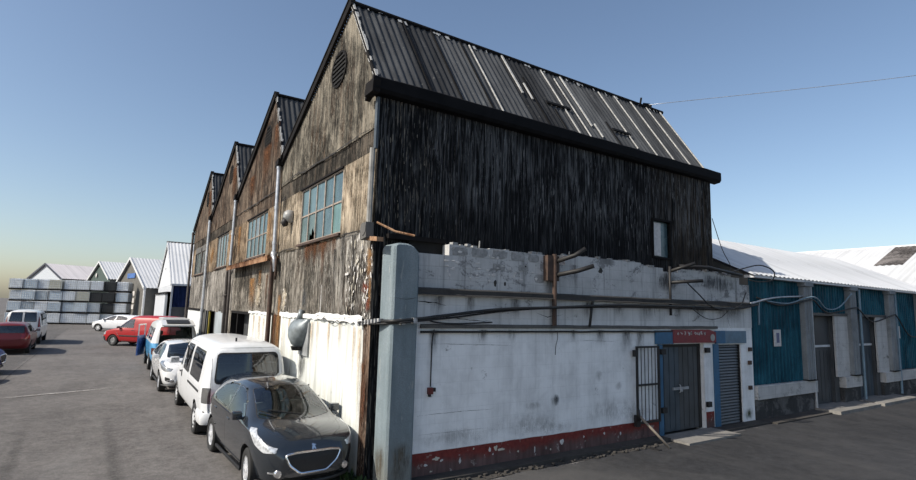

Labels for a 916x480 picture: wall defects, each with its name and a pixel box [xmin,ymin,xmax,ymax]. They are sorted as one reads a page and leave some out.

peeling [343,233,372,322]